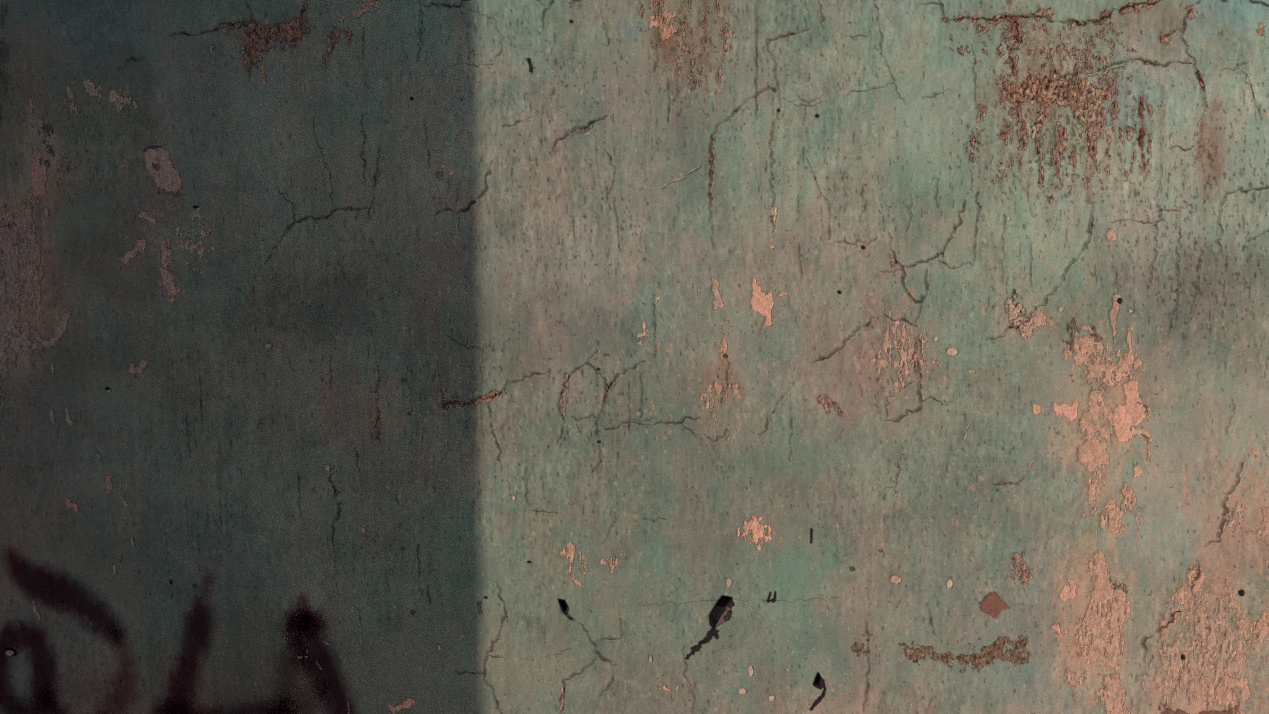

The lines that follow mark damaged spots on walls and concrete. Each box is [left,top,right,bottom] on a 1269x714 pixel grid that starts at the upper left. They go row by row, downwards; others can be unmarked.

crack [931,0,1207,106]
peeling [0,98,72,398]
crack [439,390,506,460]
crack [557,306,698,466]
peeling [749,277,787,326]
crack [817,196,1005,422]
peeling [869,308,957,394]
crack [987,202,1094,340]
crack [1142,187,1268,325]
peeling [737,516,772,553]
peeling [1004,288,1152,714]
peeling [1140,565,1269,714]